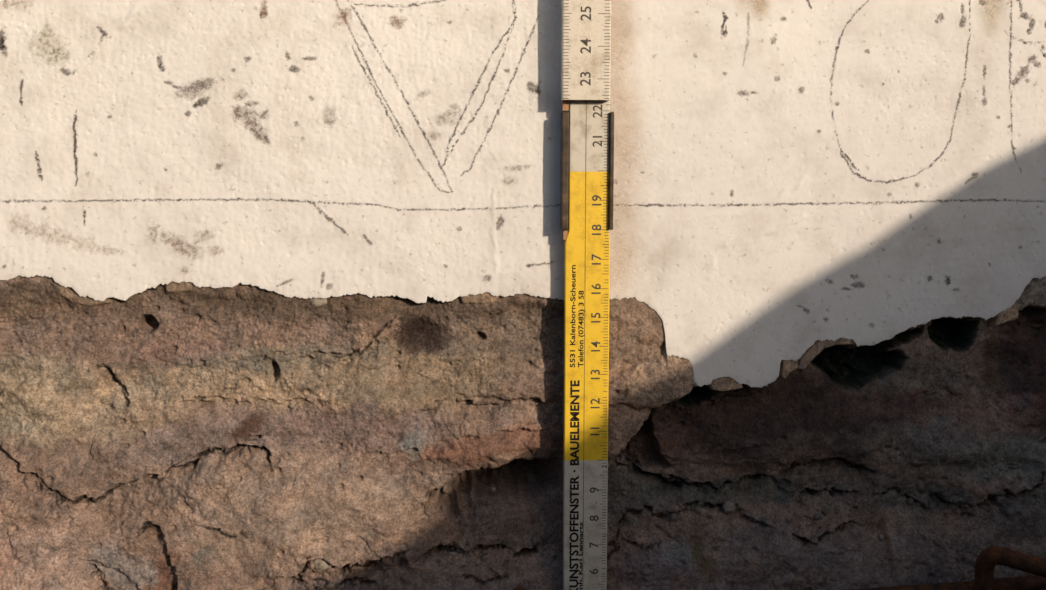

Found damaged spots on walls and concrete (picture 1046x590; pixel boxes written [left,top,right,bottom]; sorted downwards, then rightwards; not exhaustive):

crack [18,464,138,504]
crack [167,444,273,473]
spalling [0,275,564,590]
crack [607,449,861,559]
spalling [607,276,1046,590]
crack [793,457,1045,512]
crack [423,544,538,584]